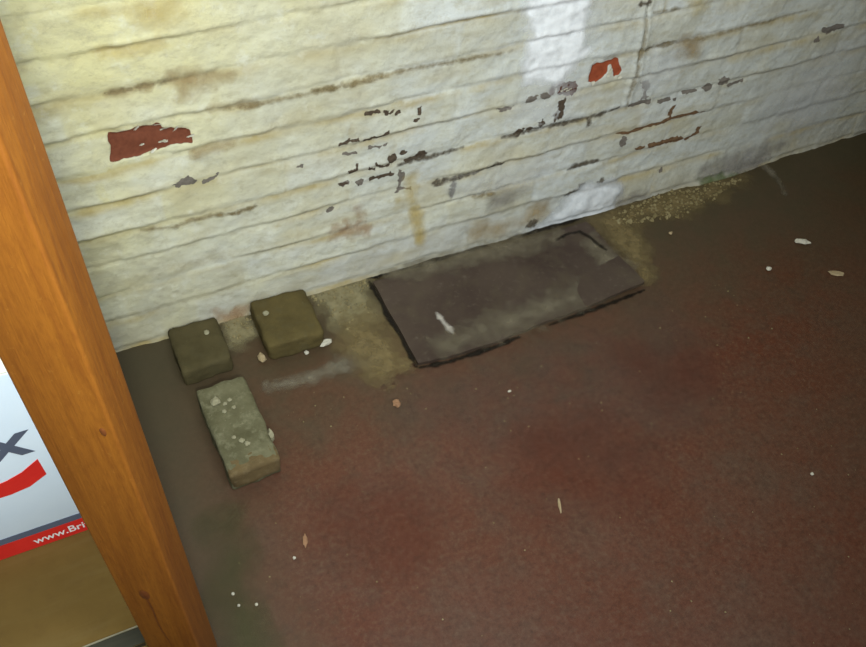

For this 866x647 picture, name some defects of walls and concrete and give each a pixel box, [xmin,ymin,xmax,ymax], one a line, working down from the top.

water stain [522,0,591,85]
peeling [588,57,622,86]
peeling [513,81,578,137]
spalling [628,76,743,107]
peeling [108,123,194,162]
spalling [338,130,427,193]
spalling [619,126,701,150]